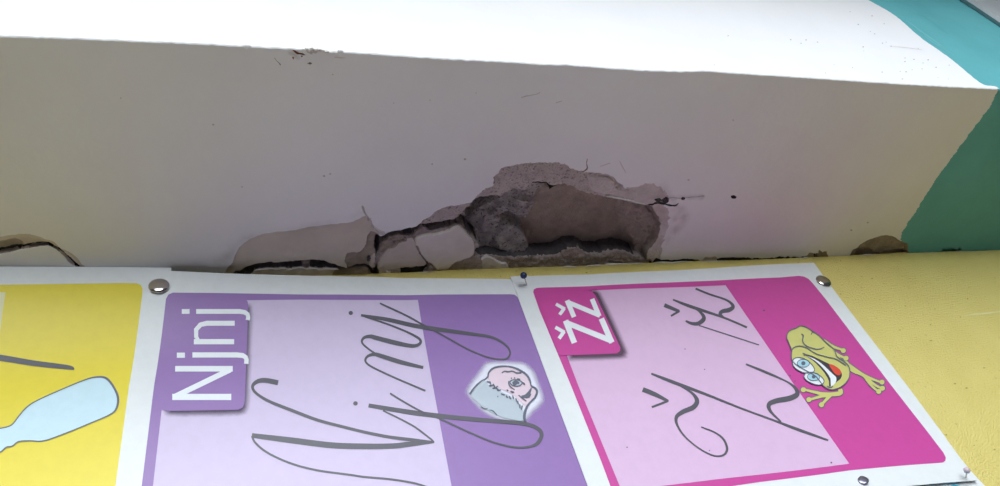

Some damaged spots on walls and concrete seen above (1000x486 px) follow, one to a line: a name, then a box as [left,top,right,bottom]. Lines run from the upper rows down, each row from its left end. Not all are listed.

flaking render [224,216,386,276]
flaking render [449,162,690,277]
flaking render [840,235,909,261]